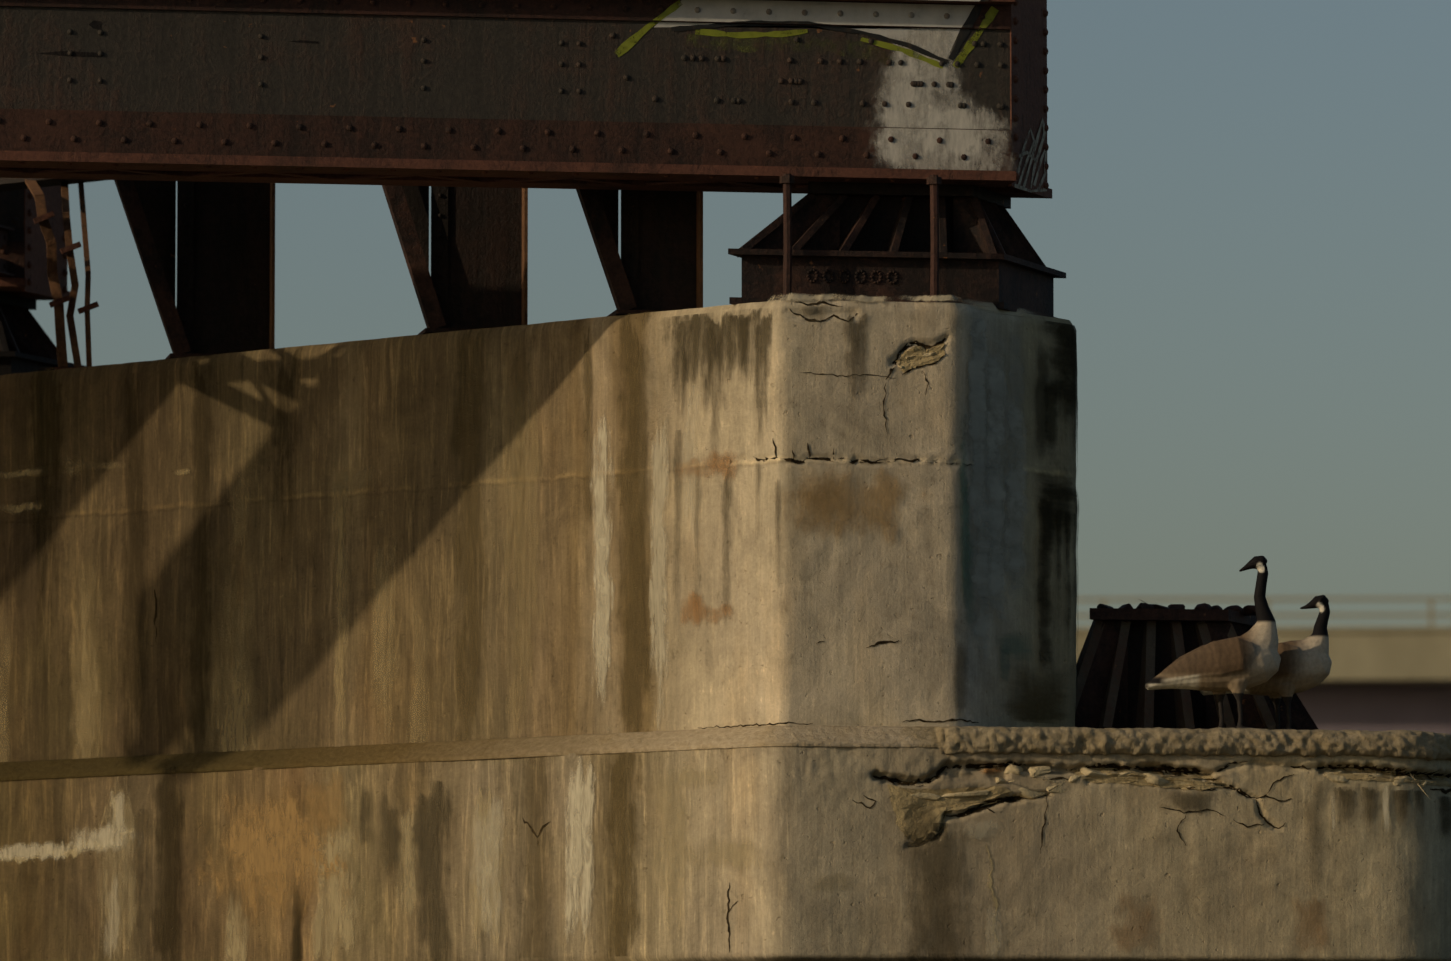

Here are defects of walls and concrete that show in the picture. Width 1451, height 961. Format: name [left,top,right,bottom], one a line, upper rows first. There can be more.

leakage [674,308,771,396]
spalling [883,338,946,431]
leakage [1045,321,1078,442]
crack [730,438,1002,469]
leakage [1039,481,1079,660]
spalling [852,761,1255,847]
spalling [1290,764,1451,798]